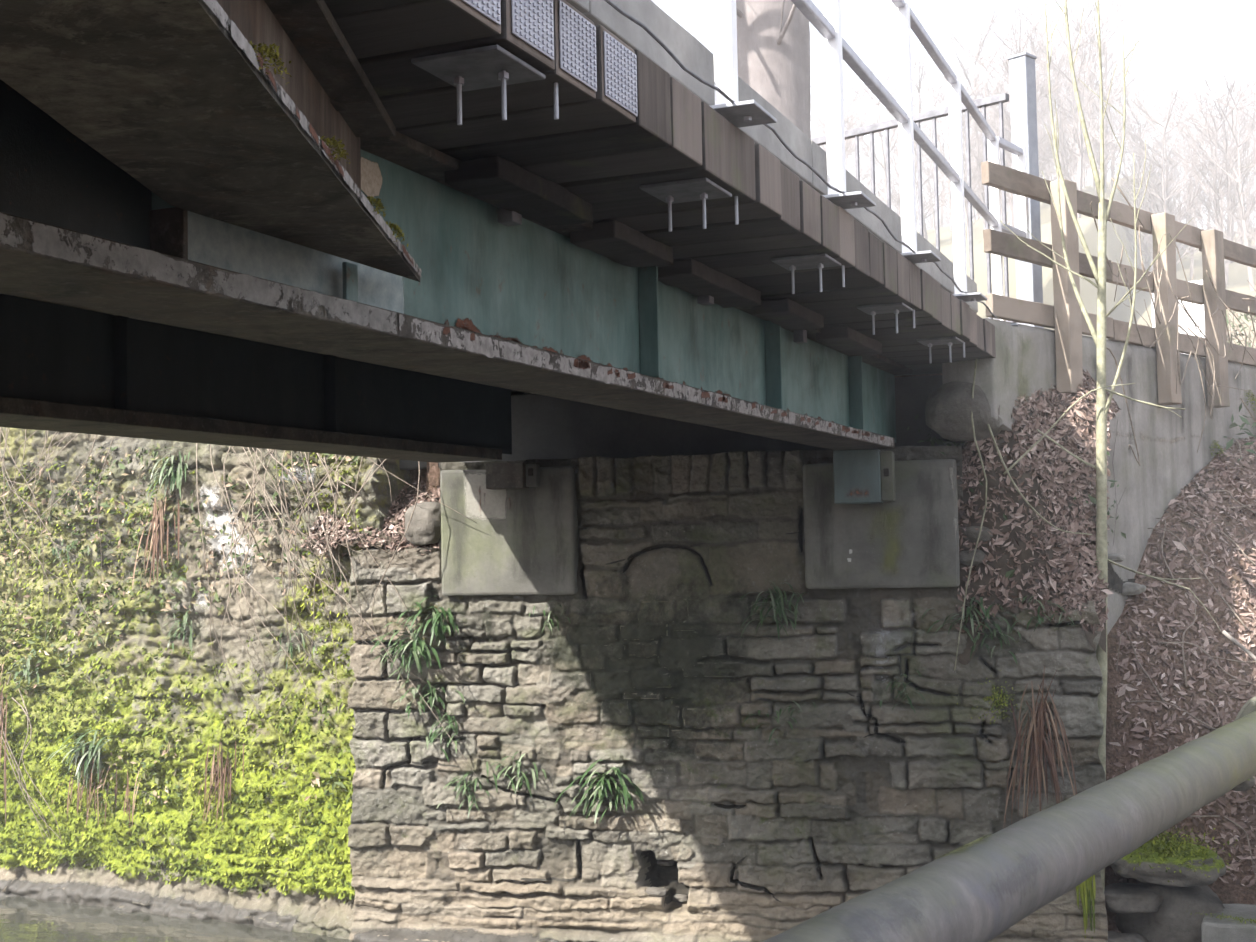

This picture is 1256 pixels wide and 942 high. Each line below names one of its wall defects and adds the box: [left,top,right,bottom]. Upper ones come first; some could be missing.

peeling [203,0,421,277]
peeling [0,212,893,446]
corrosion [443,318,636,379]
corrosion [659,378,731,403]
crack [846,692,905,743]
crack [730,856,781,902]
crack [811,838,822,876]